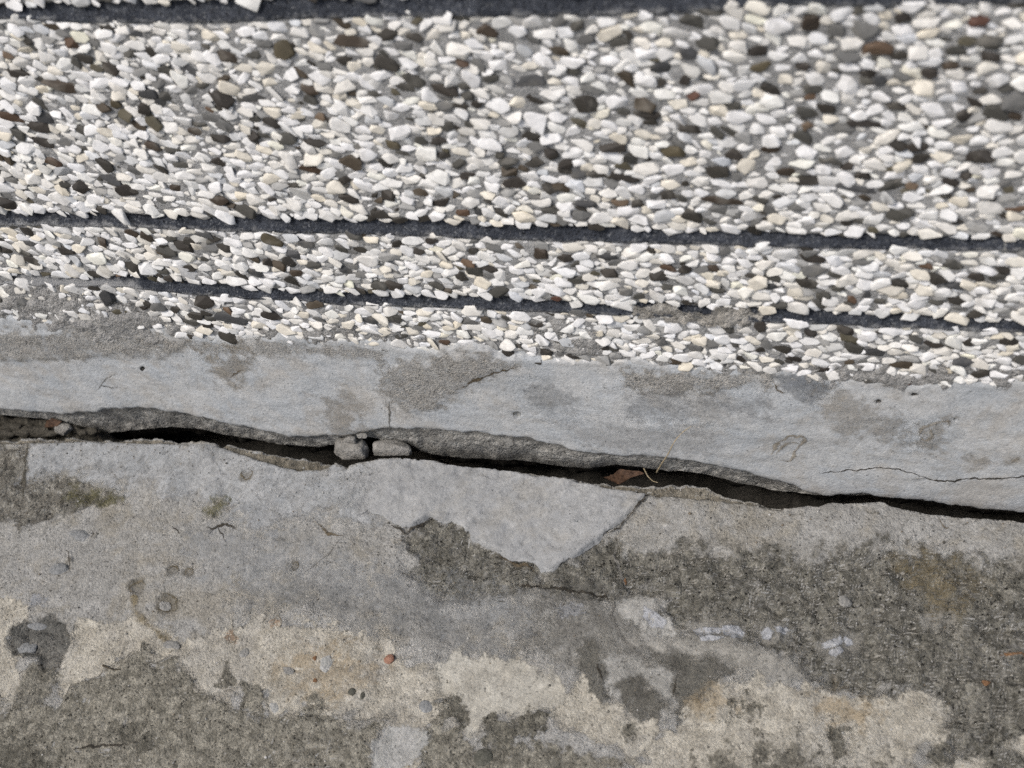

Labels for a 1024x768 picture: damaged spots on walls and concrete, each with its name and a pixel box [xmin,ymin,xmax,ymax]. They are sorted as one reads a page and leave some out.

crack [0,375,1024,529]
spalling [0,458,1024,768]